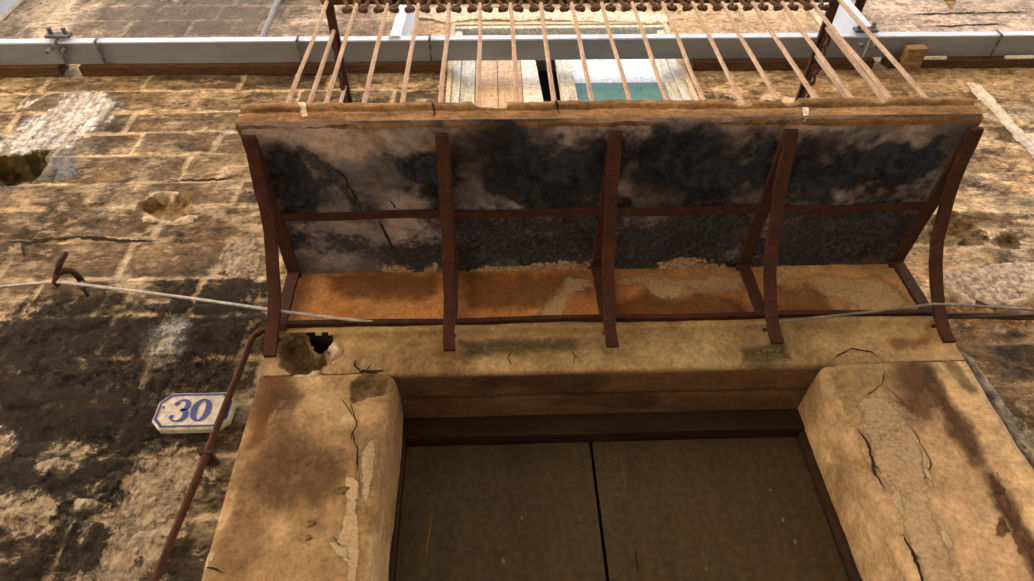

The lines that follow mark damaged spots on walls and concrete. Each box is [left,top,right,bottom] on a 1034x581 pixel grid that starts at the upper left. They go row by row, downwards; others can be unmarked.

spalling [0,150,58,187]
spalling [135,191,198,225]
spalling [277,332,343,378]
crack [353,359,384,374]
crack [341,398,359,475]
crack [836,348,936,492]
water stain [898,361,1034,571]
crack [903,533,924,581]